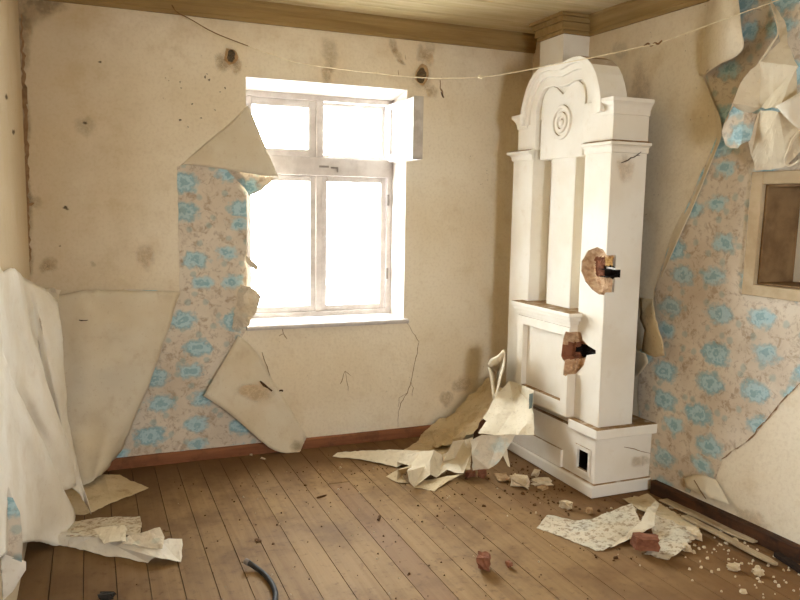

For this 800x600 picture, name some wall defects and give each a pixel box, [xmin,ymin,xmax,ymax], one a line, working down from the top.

spalling [582,247,620,294]
crack [398,323,419,416]
spalling [561,332,596,376]
spalling [630,532,661,552]